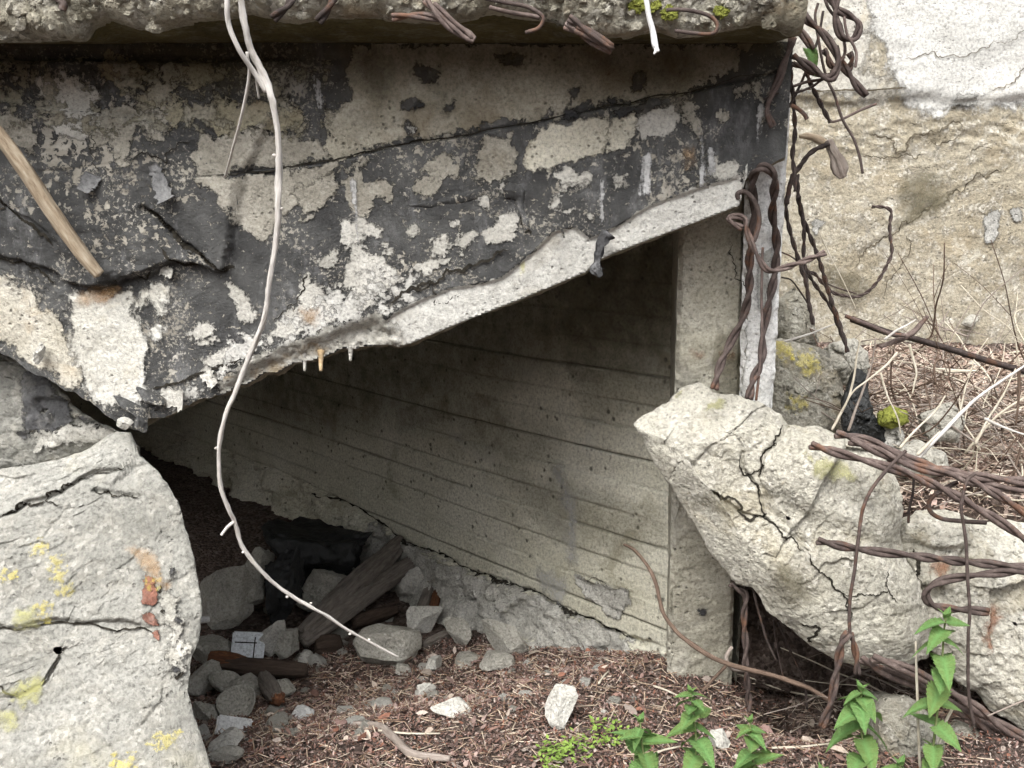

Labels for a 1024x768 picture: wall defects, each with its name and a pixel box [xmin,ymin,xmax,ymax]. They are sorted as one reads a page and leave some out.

crack [906,30,1024,60]
crack [200,72,774,176]
peeling [716,78,766,124]
crack [0,199,54,247]
crack [0,258,54,283]
crack [94,208,235,284]
peeling [0,44,753,412]
spalling [756,248,772,309]
crack [850,120,1010,296]
crack [710,425,896,618]
spalling [360,521,636,654]
crack [802,624,821,643]